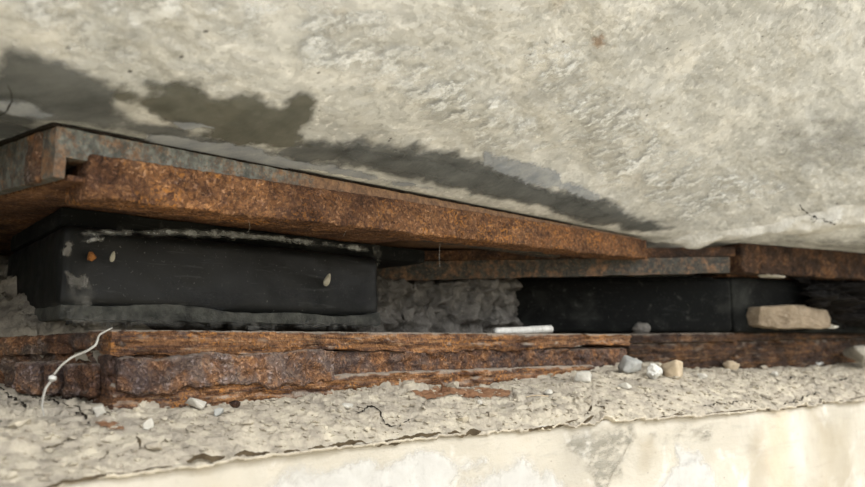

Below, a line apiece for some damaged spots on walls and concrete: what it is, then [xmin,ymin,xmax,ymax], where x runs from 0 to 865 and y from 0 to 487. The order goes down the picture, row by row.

water stain [0,50,667,232]
rust [412,386,510,400]